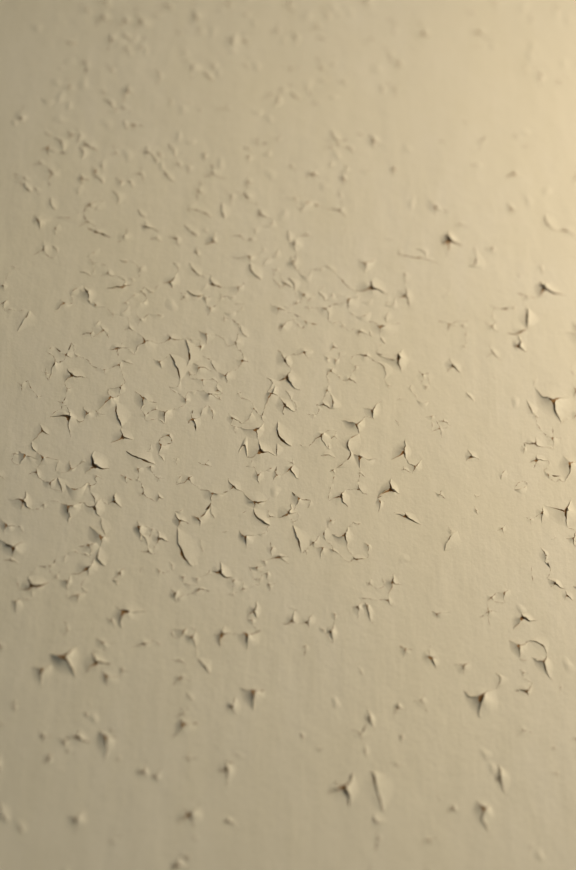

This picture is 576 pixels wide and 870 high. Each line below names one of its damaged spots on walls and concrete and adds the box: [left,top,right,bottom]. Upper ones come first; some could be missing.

peeling [33,382,173,440]
peeling [263,346,314,415]
peeling [357,349,409,372]
peeling [534,385,576,424]
peeling [18,450,109,489]
peeling [172,414,299,527]
peeling [375,478,399,512]
peeling [535,500,576,547]
peeling [11,493,122,616]
peeling [31,637,121,687]
peeling [509,613,554,679]
peeling [464,686,499,718]